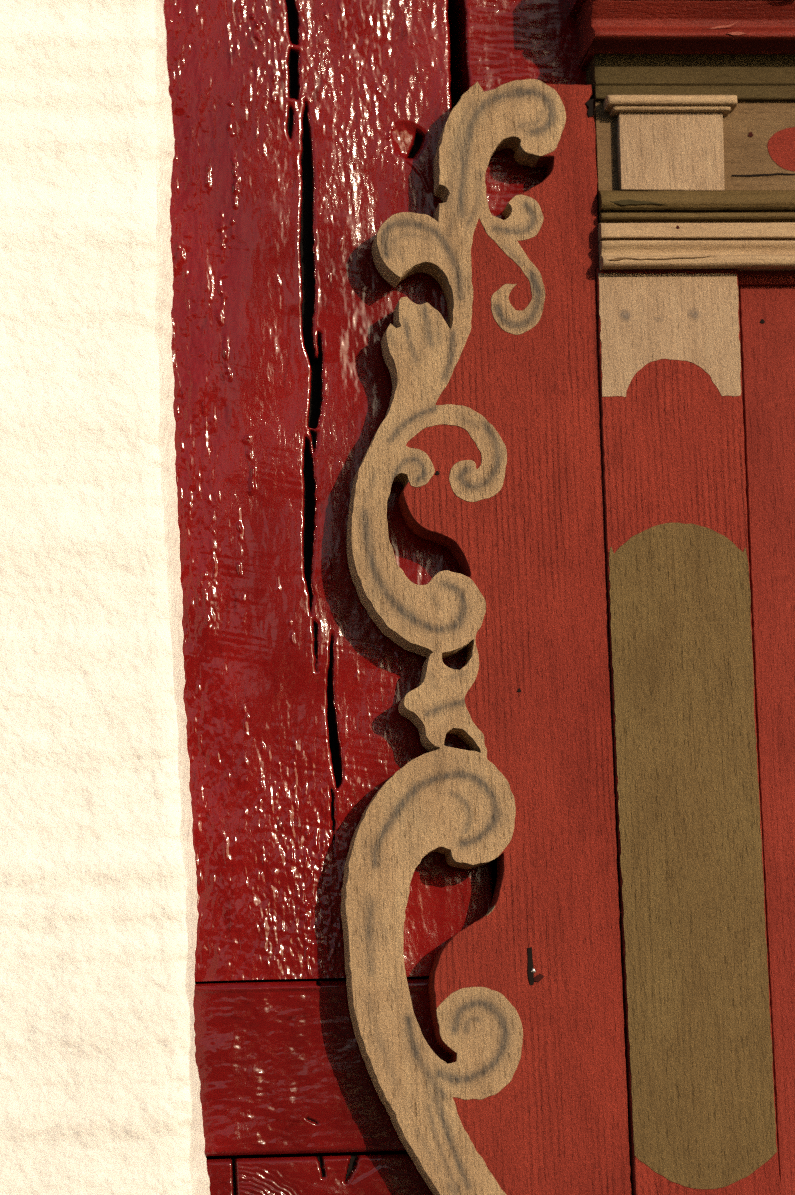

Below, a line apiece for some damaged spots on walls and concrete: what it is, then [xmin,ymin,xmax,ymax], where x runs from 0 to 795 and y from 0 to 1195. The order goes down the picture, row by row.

crack [285,0,343,840]